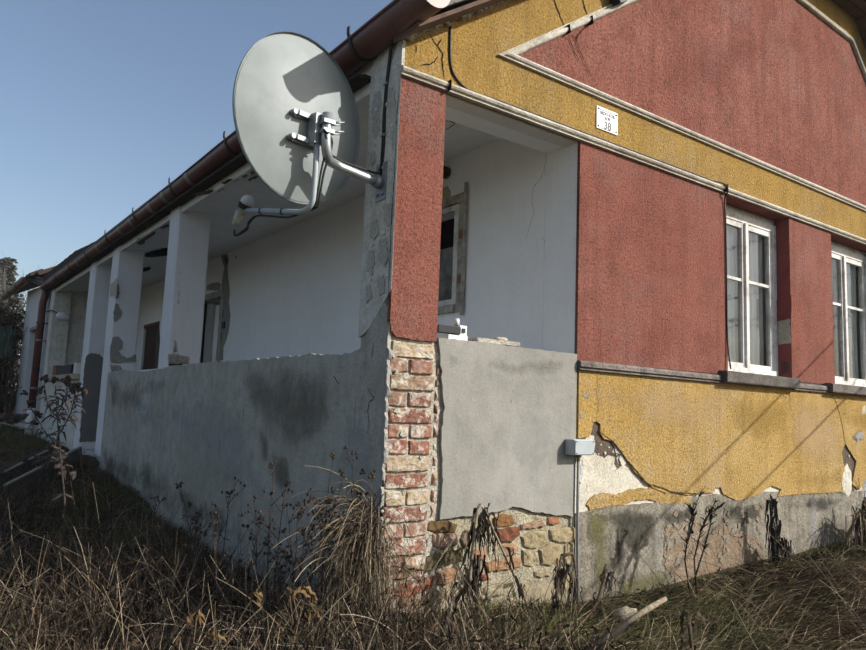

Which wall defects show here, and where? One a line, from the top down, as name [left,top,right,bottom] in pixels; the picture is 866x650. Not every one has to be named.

crack [416,35,452,92]
crack [554,0,594,77]
spalling [110,278,122,322]
spalling [206,254,230,361]
spalling [110,336,137,372]
spalling [842,446,855,498]
peeling [574,423,779,583]
damp [617,513,653,570]